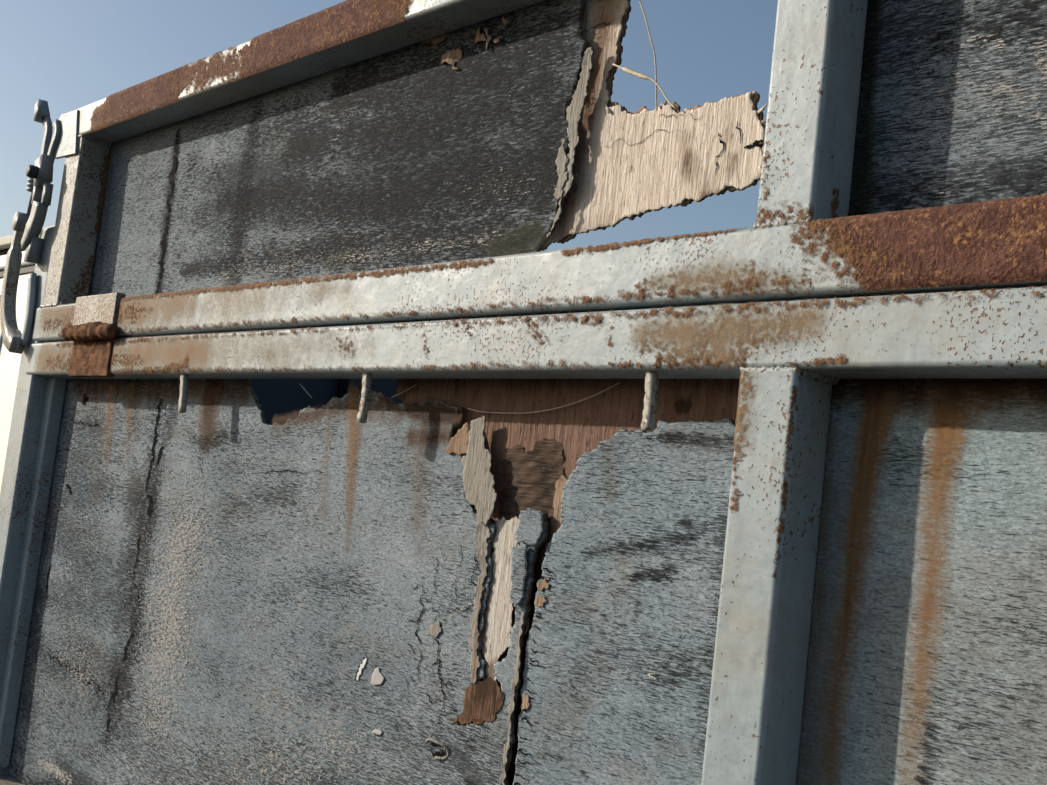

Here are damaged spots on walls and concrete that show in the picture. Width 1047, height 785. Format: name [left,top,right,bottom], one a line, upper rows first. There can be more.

rust [90,0,411,132]
rust [37,155,1047,511]
crack [39,381,171,765]
spalling [355,657,384,685]
peeling [425,737,450,760]
crack [405,539,488,732]
peeling [450,508,543,746]
crack [500,546,556,785]
rust [822,393,895,785]
rust [914,392,966,713]